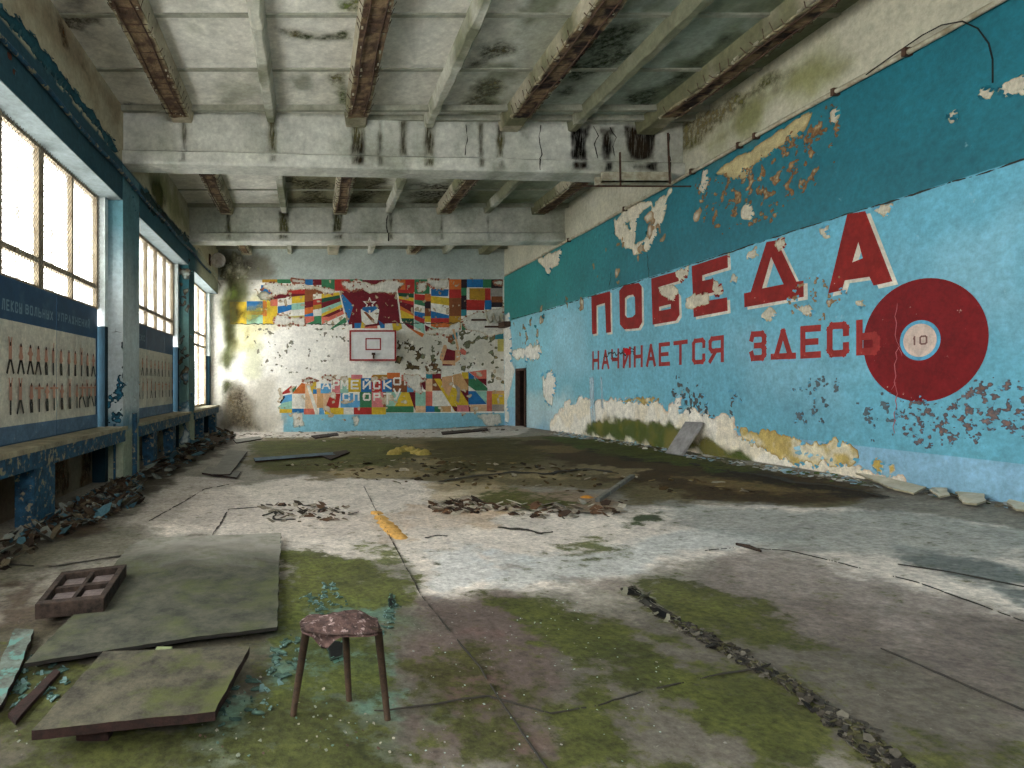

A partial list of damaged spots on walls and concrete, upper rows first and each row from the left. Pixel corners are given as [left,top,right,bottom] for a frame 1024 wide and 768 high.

peeling [0,3,120,153]
damp [571,126,656,171]
peeling [605,188,672,261]
peeling [693,104,841,235]
peeling [108,342,140,423]
damp [225,387,251,429]
peeling [247,277,545,428]
peeling [541,369,906,482]
crack [891,309,902,433]
peeling [856,377,1024,449]
crack [364,487,910,768]
crack [893,564,1024,622]